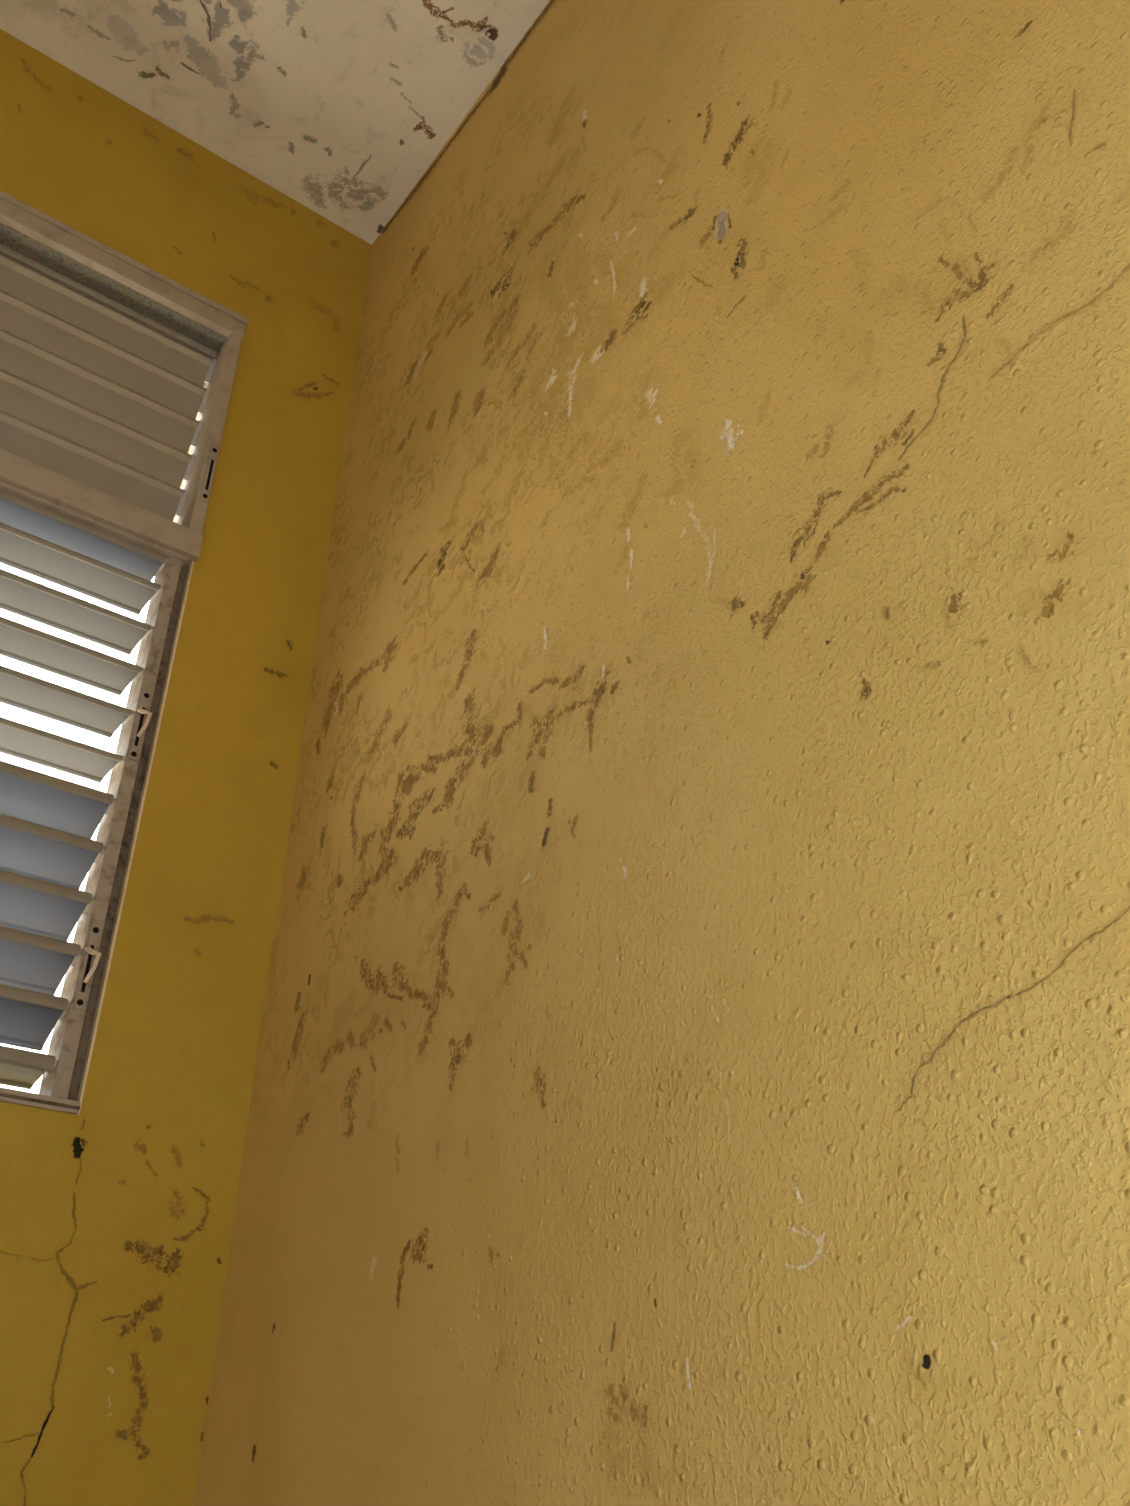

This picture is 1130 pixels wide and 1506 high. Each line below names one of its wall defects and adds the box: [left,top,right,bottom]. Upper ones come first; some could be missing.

damp [12,0,139,42]
damp [137,63,174,81]
damp [432,24,498,69]
damp [287,132,391,234]
crack [991,263,1130,378]
crack [898,315,967,461]
peeling [402,518,504,621]
peeling [313,625,632,1141]
peeling [286,973,312,1071]
crack [894,903,1130,1112]
crack [0,1159,97,1506]
peeling [101,1186,212,1461]